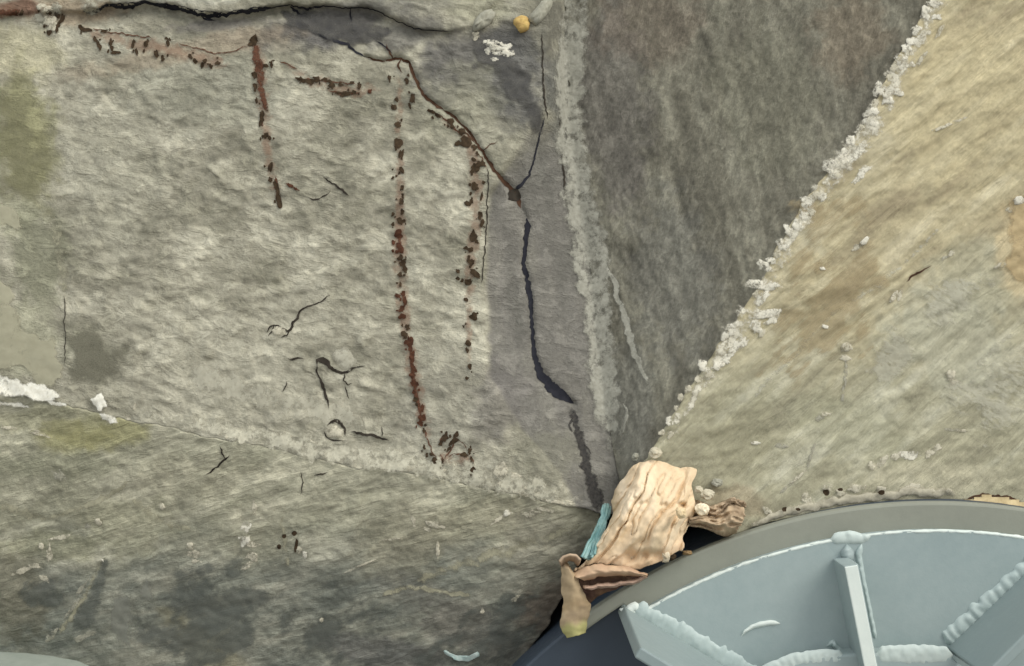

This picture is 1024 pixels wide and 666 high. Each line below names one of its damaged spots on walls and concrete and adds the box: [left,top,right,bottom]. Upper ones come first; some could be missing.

rust [78,24,372,141]
rust [264,162,300,208]
crack [83,0,604,510]
rust [387,74,479,476]
rust [427,109,486,285]